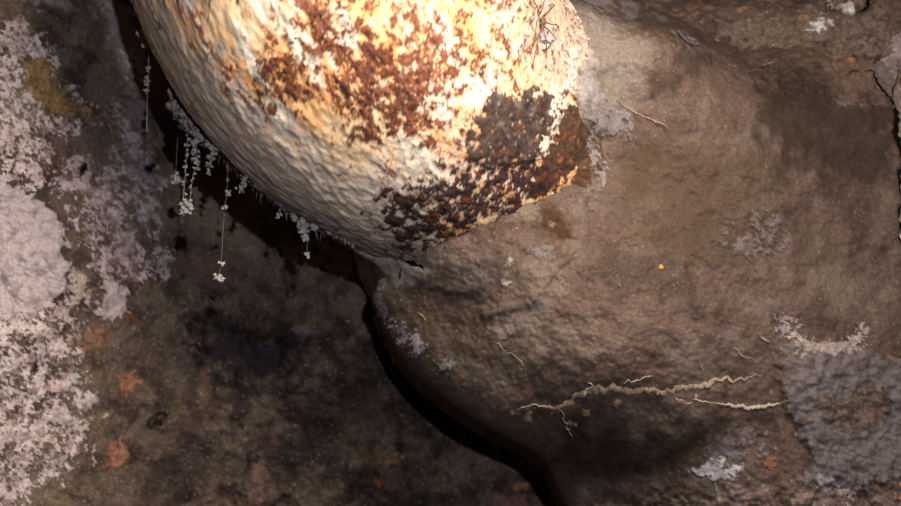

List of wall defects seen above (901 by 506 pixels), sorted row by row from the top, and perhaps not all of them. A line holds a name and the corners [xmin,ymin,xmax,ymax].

corrosion [249,55,312,122]
corrosion [311,0,432,148]
corrosion [360,85,609,261]
crack [850,53,901,243]
efflorescence [0,14,176,506]
crack [399,260,424,279]
efflorescence [774,312,870,359]